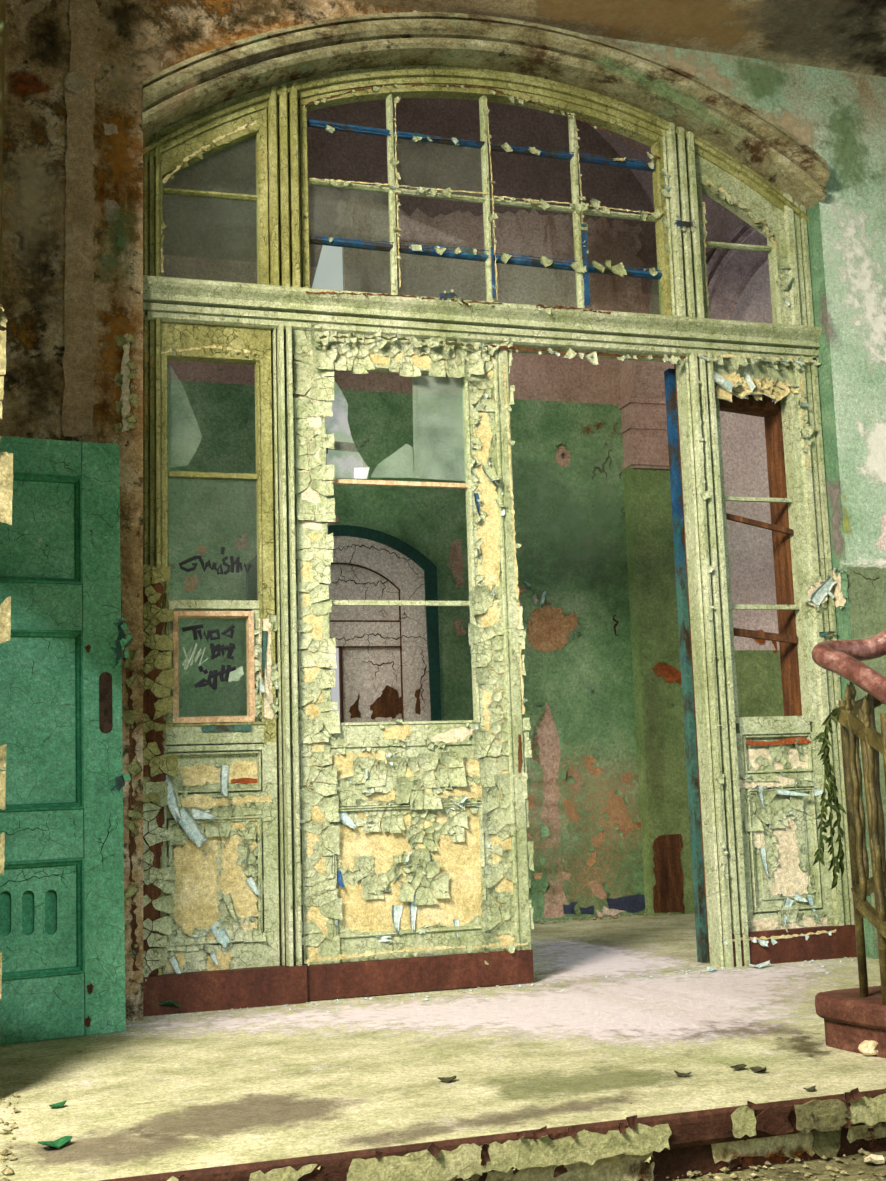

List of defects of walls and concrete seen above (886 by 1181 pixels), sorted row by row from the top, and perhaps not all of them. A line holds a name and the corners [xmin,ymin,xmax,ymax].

leakage [112,27,202,100]
leakage [539,0,886,91]
leakage [759,109,814,149]
corrosion [95,112,142,258]
leakage [5,150,66,320]
corrosion [94,301,139,438]
crack [328,544,422,600]
crack [330,633,429,711]
peeling [287,323,836,966]
peeling [109,565,279,988]
peeling [347,1115,672,1181]
peeling [711,1088,886,1169]